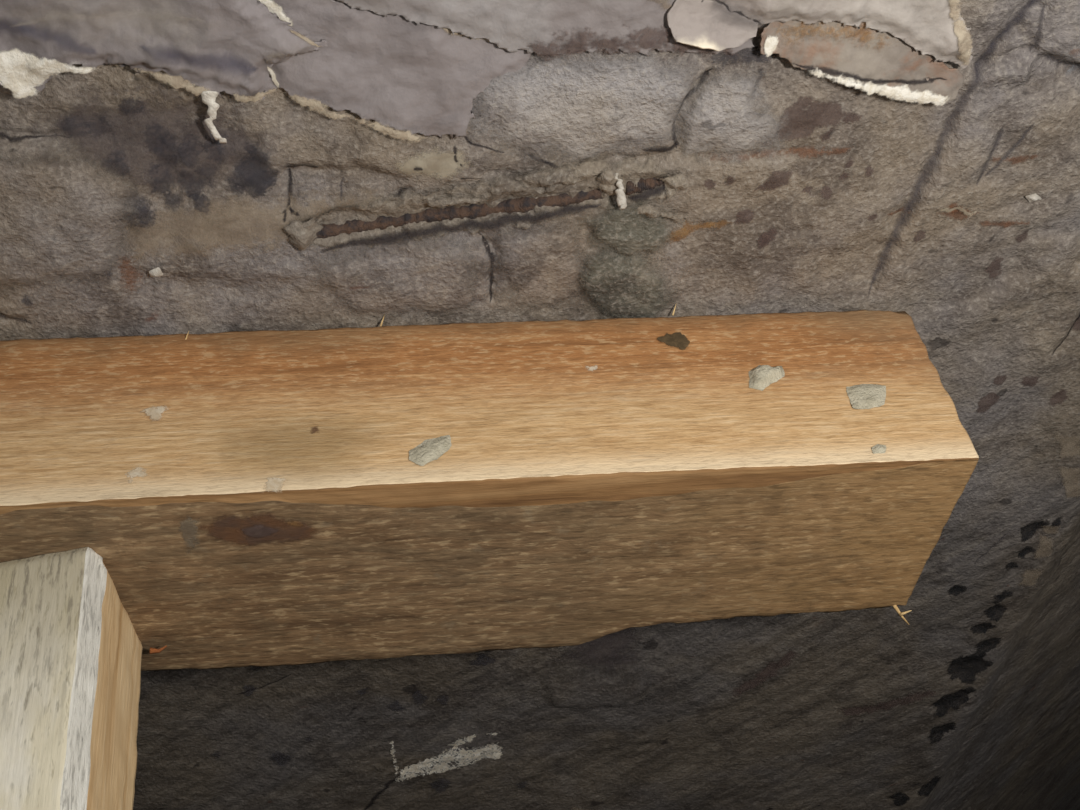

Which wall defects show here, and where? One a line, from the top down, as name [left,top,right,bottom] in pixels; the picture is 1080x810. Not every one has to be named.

peeling [0,0,973,142]
water stain [58,99,254,186]